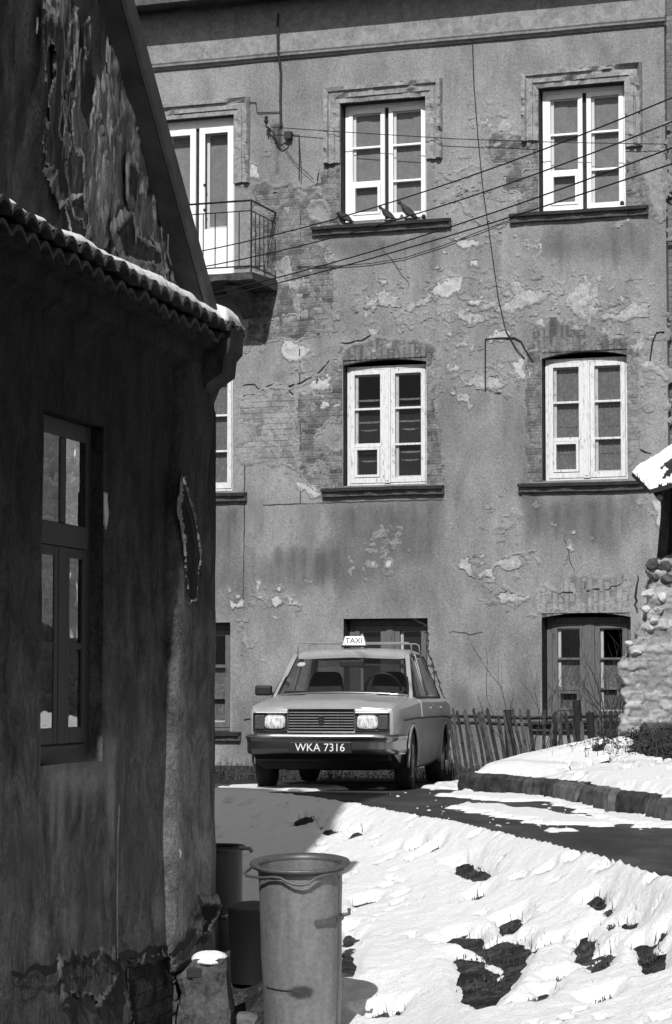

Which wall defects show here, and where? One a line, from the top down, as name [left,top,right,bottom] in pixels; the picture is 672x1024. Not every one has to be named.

peeling [36,0,176,285]
crack [238,333,378,400]
flaking render [233,98,672,619]
flaking render [177,474,202,610]
peeling [217,577,304,629]
flaking render [193,894,222,945]
flaking render [55,943,179,1024]